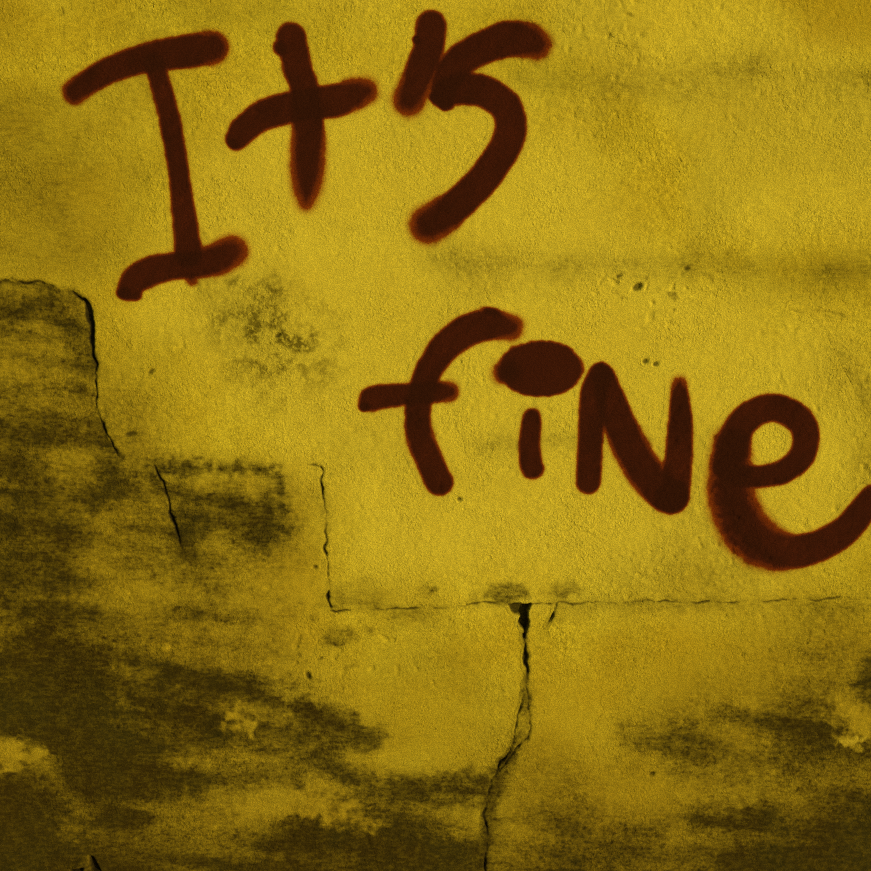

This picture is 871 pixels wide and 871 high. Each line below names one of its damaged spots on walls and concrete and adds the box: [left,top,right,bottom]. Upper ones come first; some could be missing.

crack [0,274,127,463]
crack [150,462,184,549]
water stain [0,285,541,871]
water stain [164,257,379,436]
crack [303,460,871,871]
water stain [467,575,871,871]